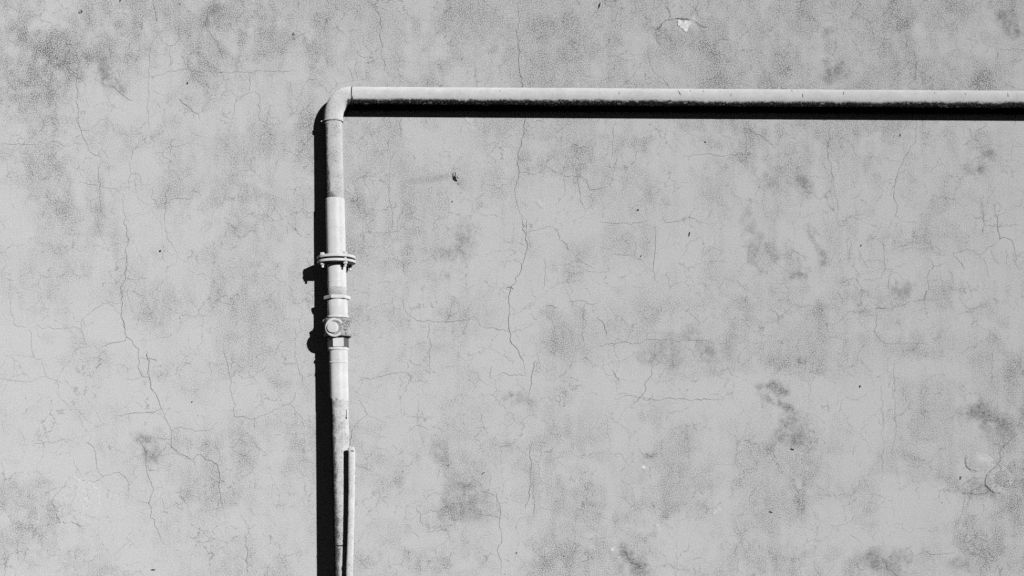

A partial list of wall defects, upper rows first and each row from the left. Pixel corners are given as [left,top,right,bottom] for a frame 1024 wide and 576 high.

crack [0,11,303,540]
crack [407,12,714,402]
spalling [653,5,705,45]